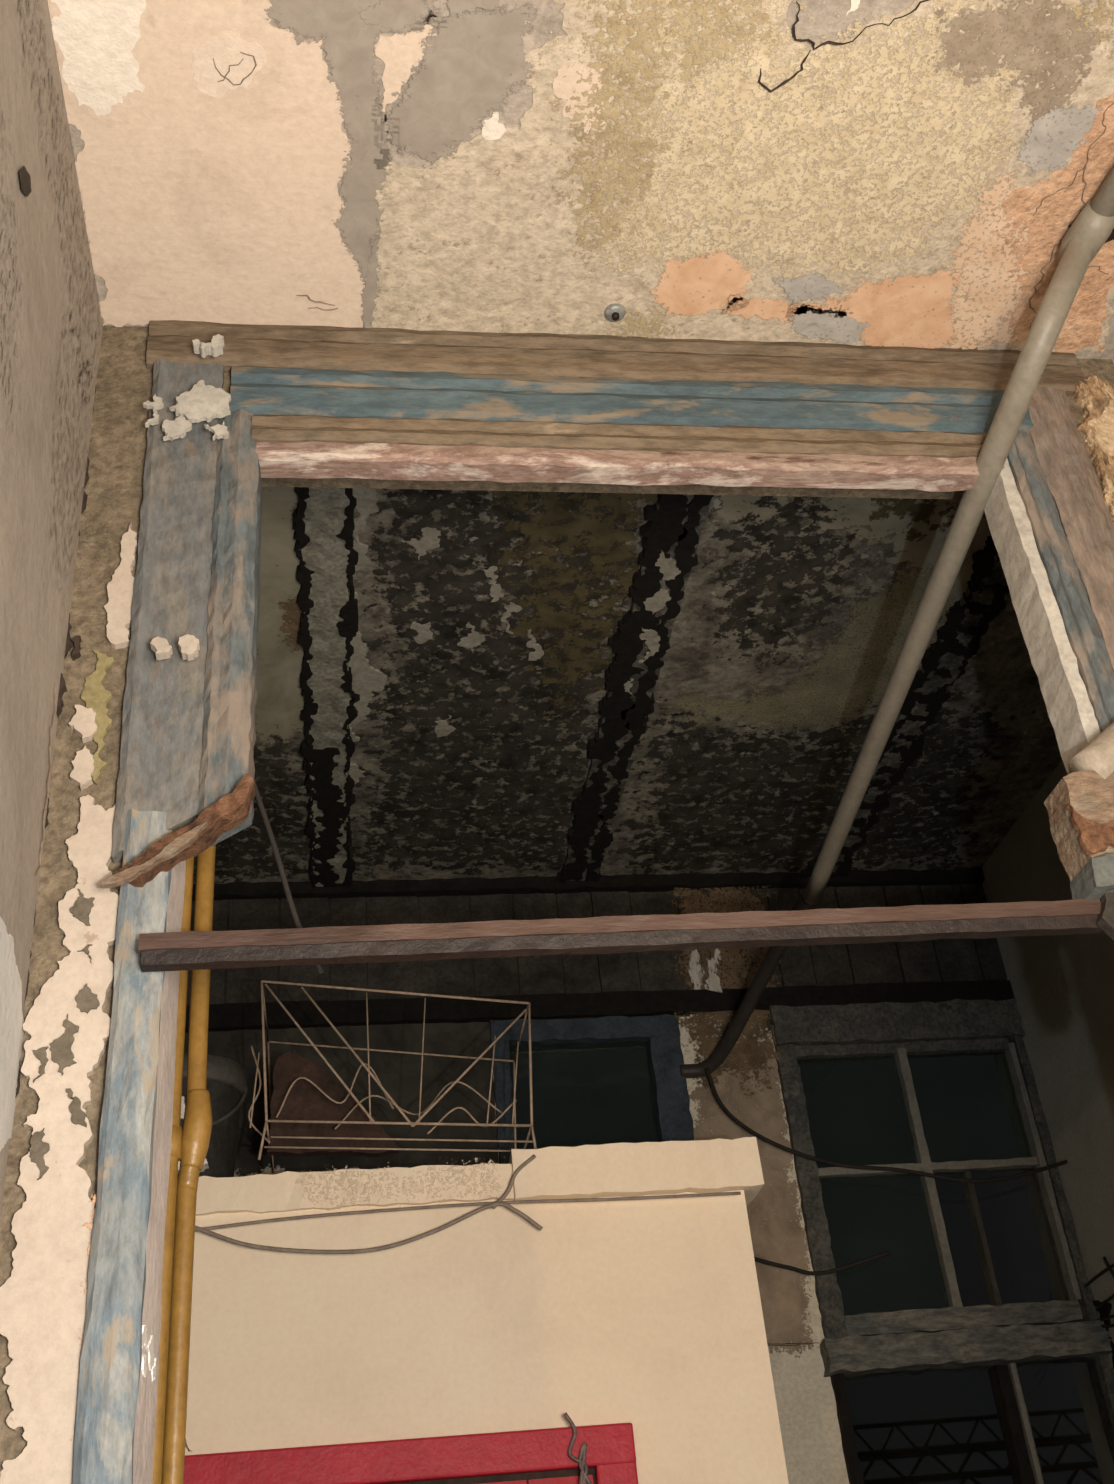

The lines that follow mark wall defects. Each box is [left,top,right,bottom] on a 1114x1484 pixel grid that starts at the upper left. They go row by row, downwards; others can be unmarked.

crack [758,0,929,93]
peeling [47,0,1114,358]
peeling [143,380,231,441]
flaking render [1072,376,1114,524]
peeling [150,634,200,661]
peeling [0,521,138,1484]
peeling [141,1325,156,1382]